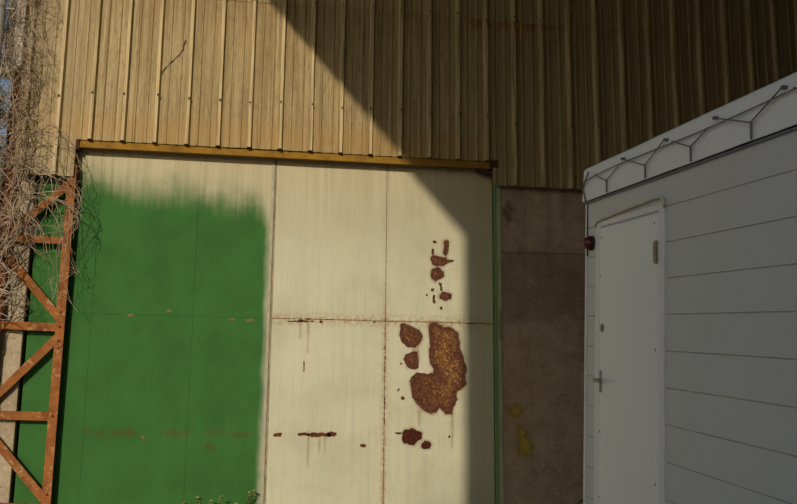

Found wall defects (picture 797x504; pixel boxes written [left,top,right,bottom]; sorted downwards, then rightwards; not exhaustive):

rust [426,240,454,310]
rust [373,321,467,414]
rust [395,428,431,449]